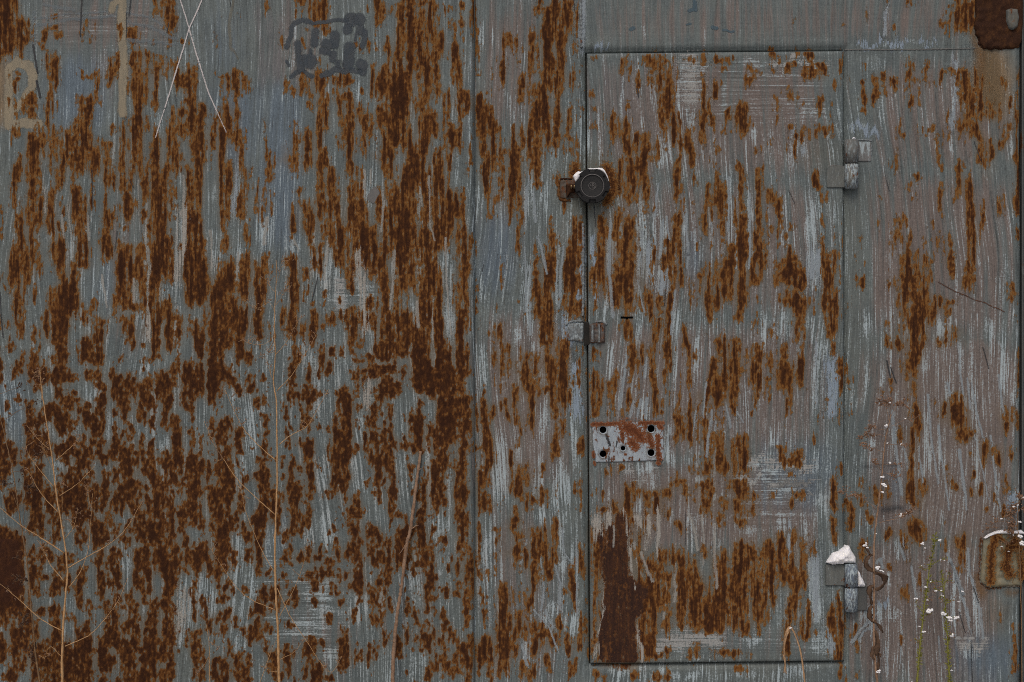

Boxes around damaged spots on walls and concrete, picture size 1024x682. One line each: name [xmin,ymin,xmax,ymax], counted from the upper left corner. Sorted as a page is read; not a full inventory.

rust [744,46,843,162]
rust [811,168,829,208]
rust [0,0,818,682]
rust [829,56,1024,603]
rust [825,590,862,682]
rust [999,609,1019,677]